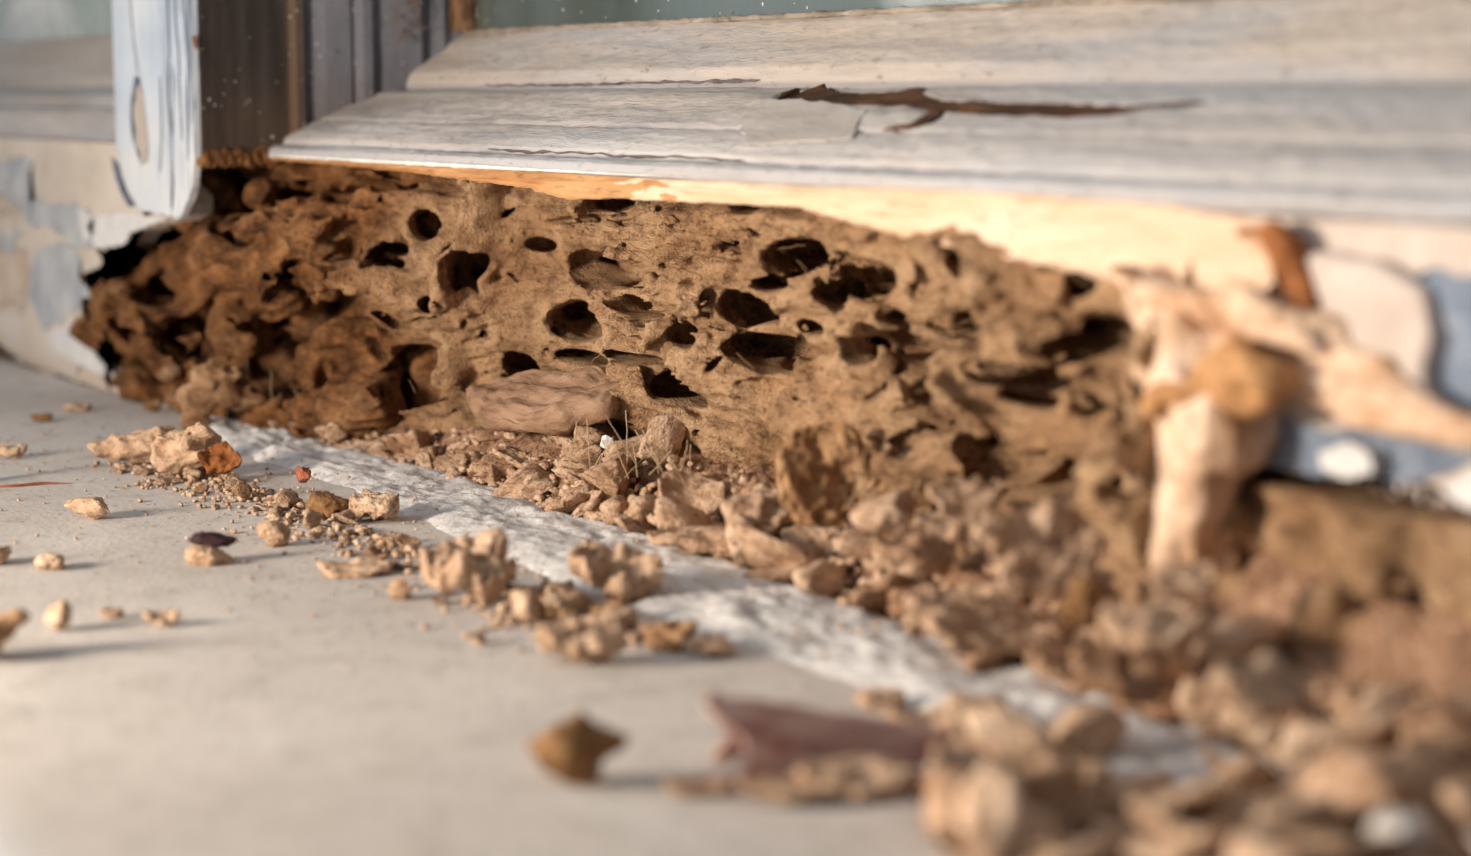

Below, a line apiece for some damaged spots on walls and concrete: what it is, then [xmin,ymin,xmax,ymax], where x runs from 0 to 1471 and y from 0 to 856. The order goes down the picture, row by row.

crack [484,78,1209,162]
peeling [0,155,169,376]
peeling [1411,267,1471,414]
peeling [1267,415,1471,508]